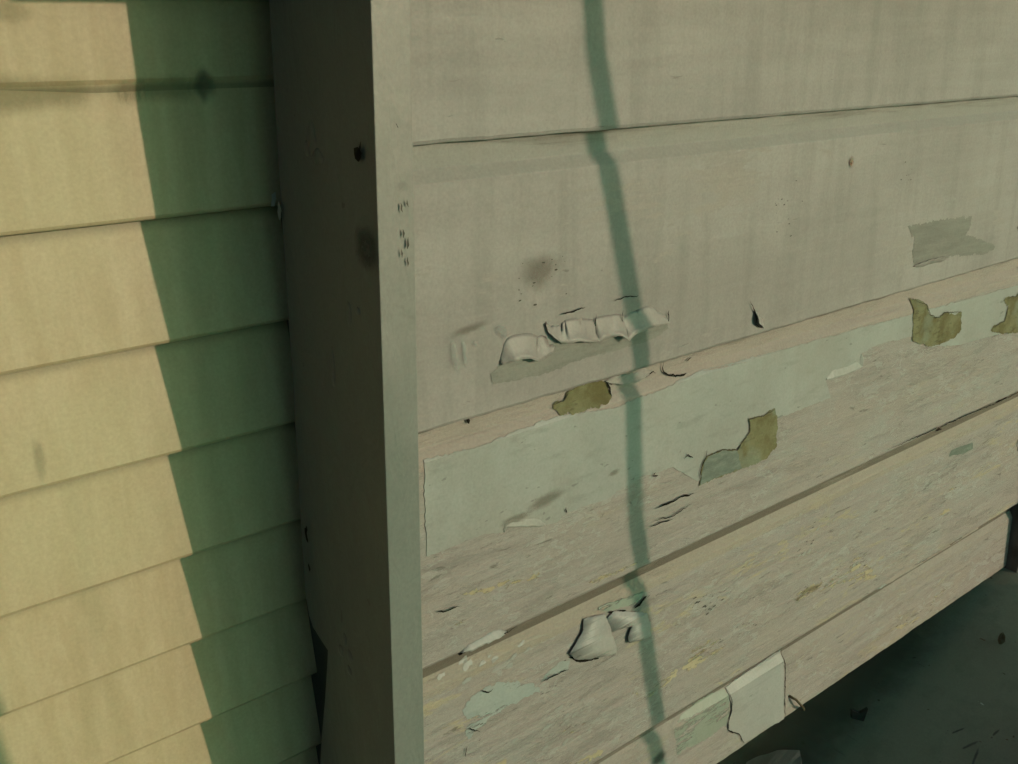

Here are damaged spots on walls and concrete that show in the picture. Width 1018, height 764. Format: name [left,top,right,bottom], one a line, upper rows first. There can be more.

peeling [423,284,1018,556]
peeling [459,592,651,756]
peeling [674,650,786,755]